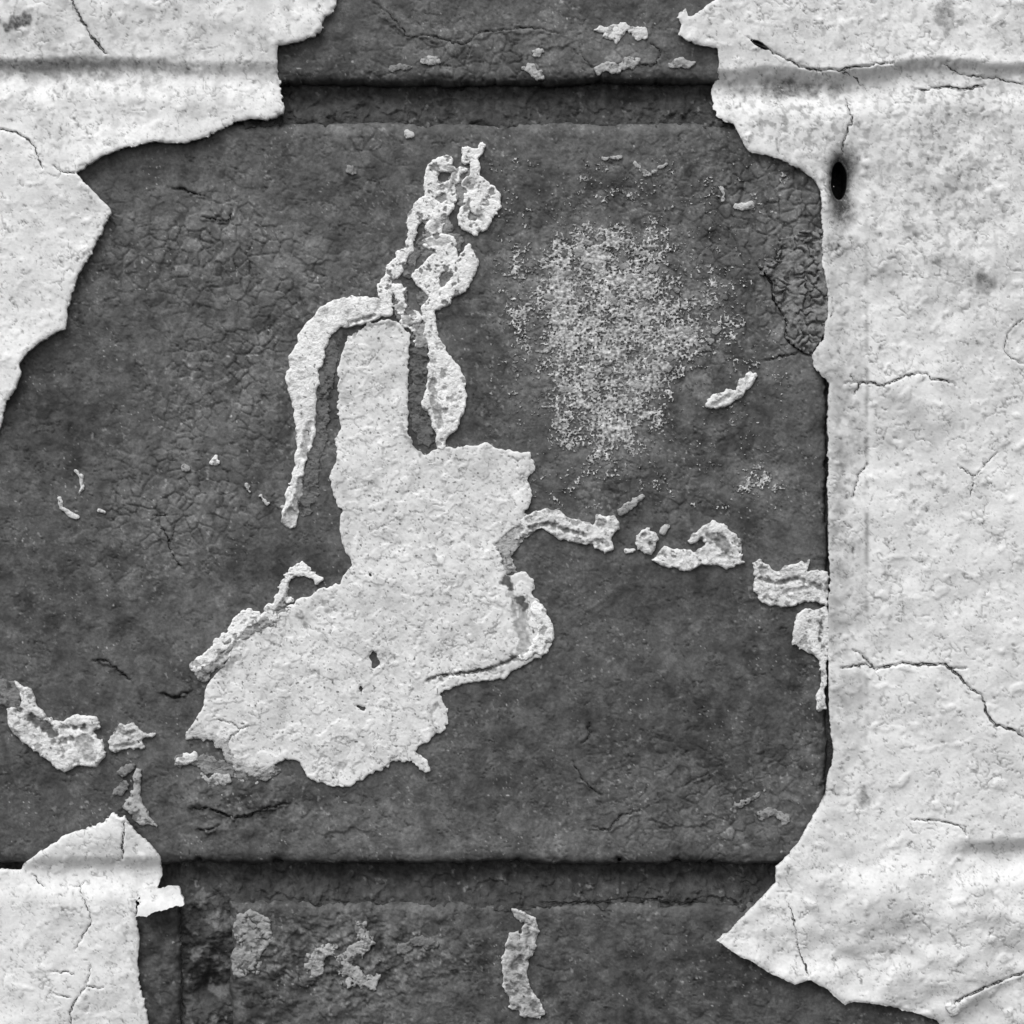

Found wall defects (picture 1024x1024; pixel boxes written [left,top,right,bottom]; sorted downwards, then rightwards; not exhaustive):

crack [748,37,895,155]
crack [918,64,1021,91]
peeling [0,0,337,428]
crack [757,229,832,361]
crack [845,373,954,393]
peeling [174,142,789,796]
peeling [624,0,1024,1024]
peeling [0,678,156,772]
crack [842,650,1023,737]
peeling [0,763,185,1024]
peeling [501,908,545,1019]
crack [954,972,1024,1004]